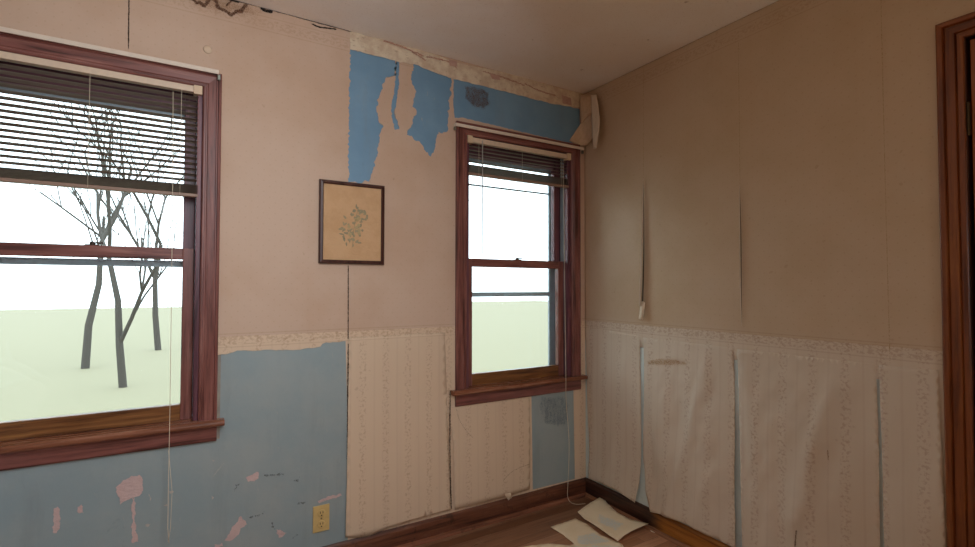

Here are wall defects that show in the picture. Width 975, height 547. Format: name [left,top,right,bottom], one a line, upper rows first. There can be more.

flaking render [350,31,581,107]
peeling [116,475,151,543]